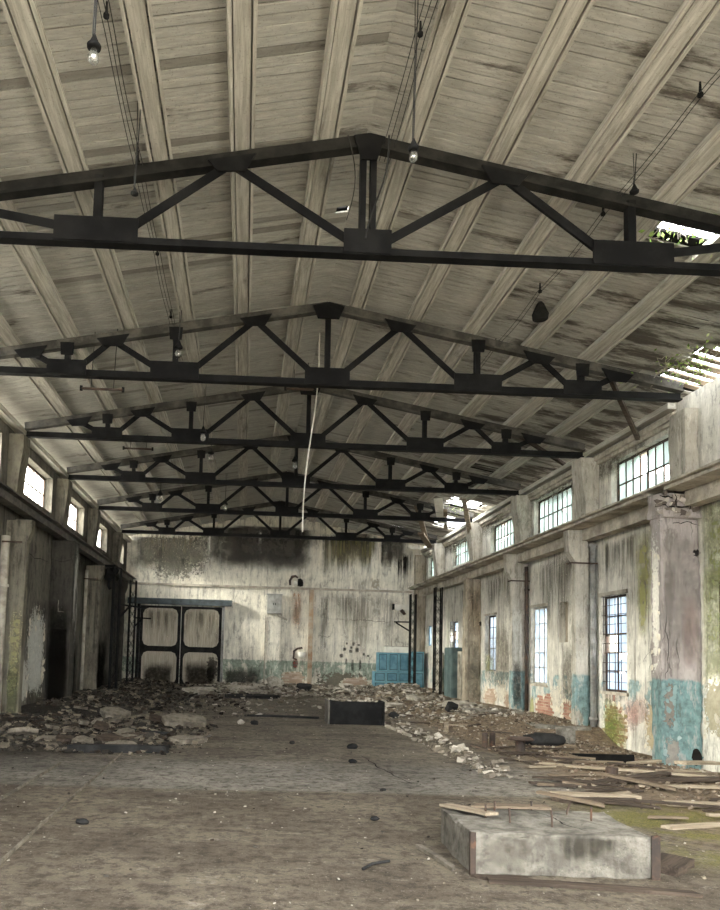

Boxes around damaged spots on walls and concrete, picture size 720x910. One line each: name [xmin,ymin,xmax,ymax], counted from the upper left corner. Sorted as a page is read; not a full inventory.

spalling [654,490,700,516]
damp [151,535,211,581]
damp [706,576,720,677]
peeling [9,605,46,698]
spalling [483,680,509,708]
spalling [535,685,572,720]
peeling [644,678,682,766]